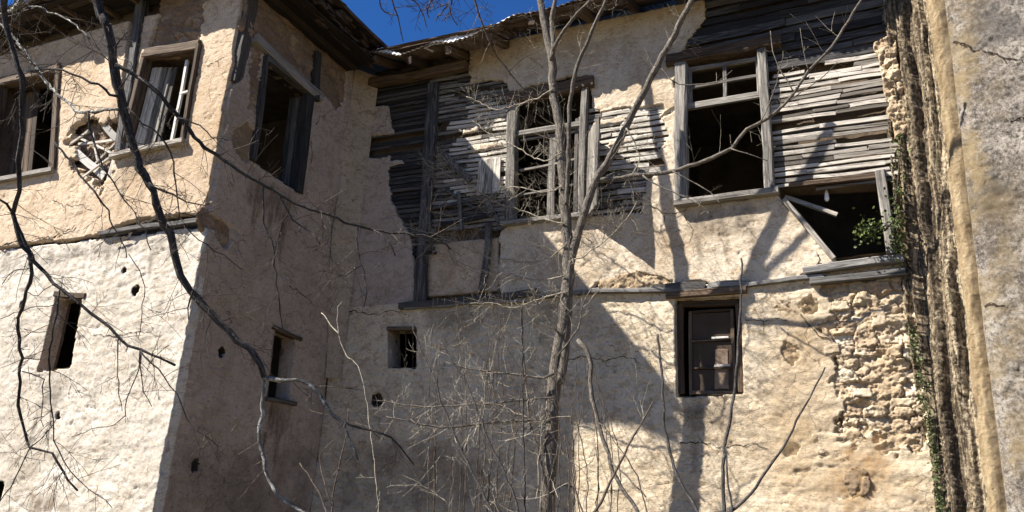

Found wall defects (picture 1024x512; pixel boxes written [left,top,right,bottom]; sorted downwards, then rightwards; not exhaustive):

crack [953,41,1024,64]
spalling [69,119,128,187]
peeling [369,68,517,256]
peeling [578,105,675,216]
peeling [195,207,229,248]
spalling [598,270,677,299]
spalling [681,0,1007,512]